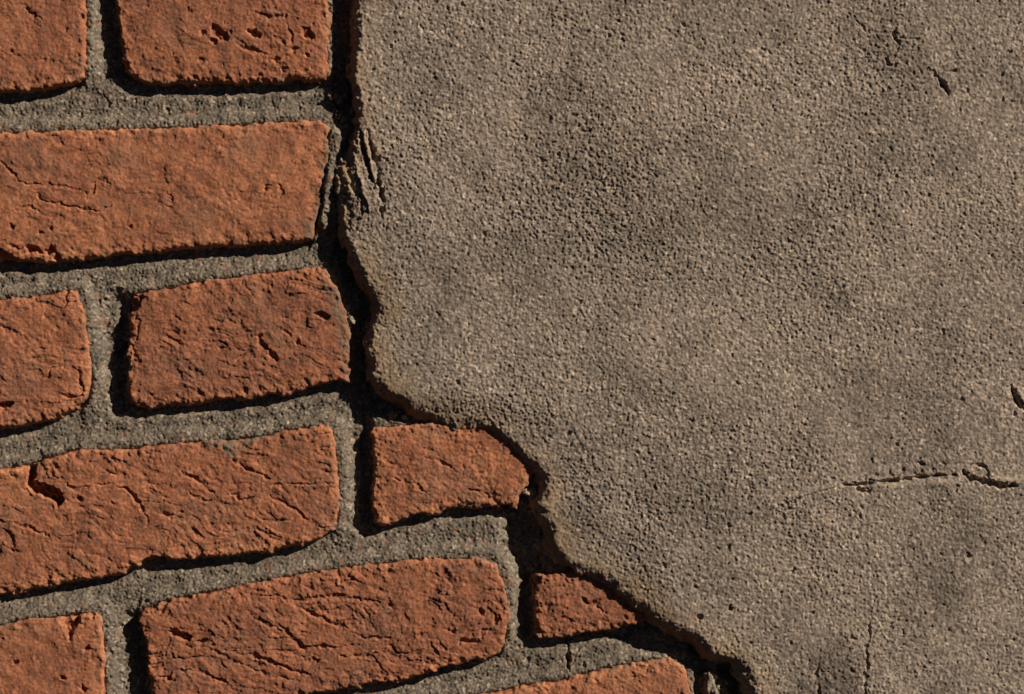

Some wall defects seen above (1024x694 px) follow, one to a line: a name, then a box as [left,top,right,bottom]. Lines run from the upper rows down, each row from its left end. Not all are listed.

hole [200,12,315,74]
spalling [0,223,73,264]
spalling [129,293,145,369]
hole [235,334,279,362]
hole [312,310,331,322]
spalling [44,364,85,400]
spalling [0,400,14,412]
hole [25,463,90,508]
crack [777,460,1019,508]
peeling [60,611,99,643]
hole [167,628,216,647]
hole [444,607,499,646]